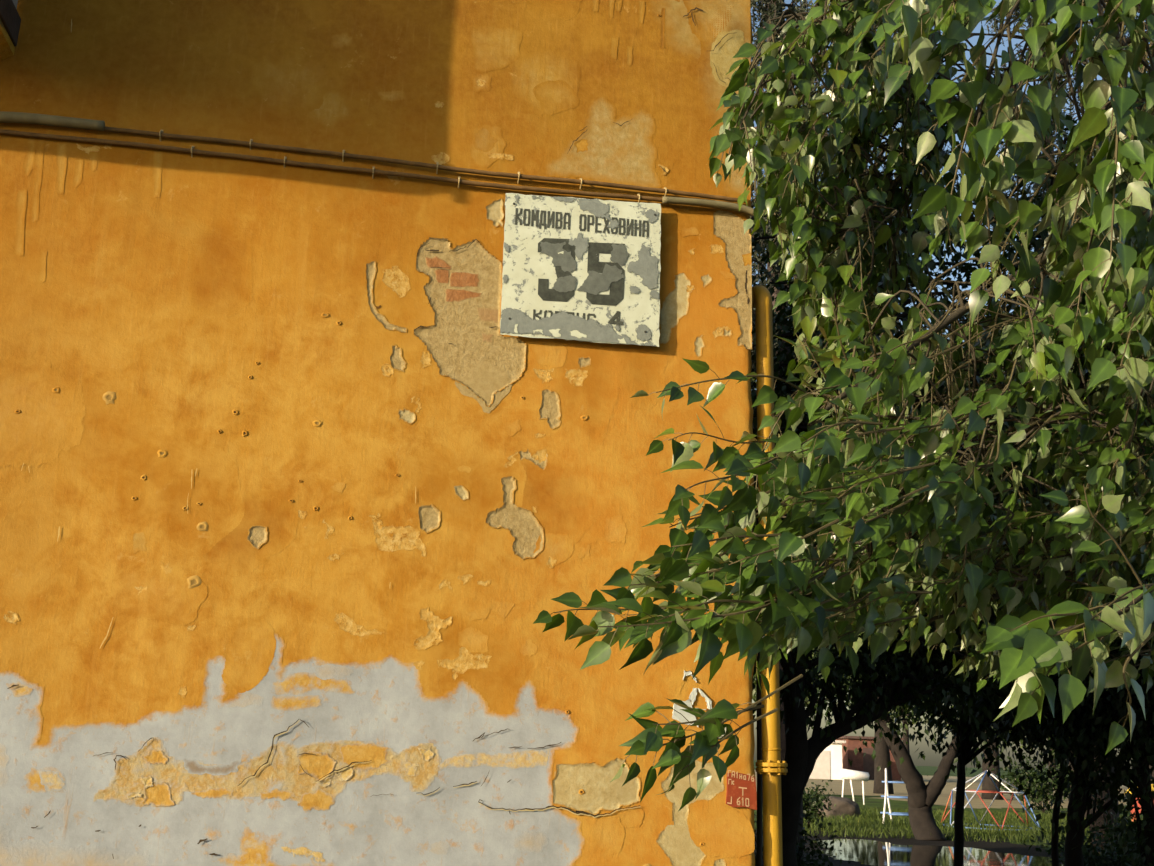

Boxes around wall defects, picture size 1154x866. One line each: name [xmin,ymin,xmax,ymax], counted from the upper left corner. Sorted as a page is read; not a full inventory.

spalling [469,25,669,188]
peeling [647,0,751,137]
spalling [659,144,752,358]
spalling [365,237,591,569]
peeling [222,621,355,712]
peeling [412,601,514,680]
peeling [23,766,66,794]
peeling [209,826,337,866]
crack [238,719,372,787]
spalling [93,737,644,855]
crack [370,770,641,818]
spalling [656,760,755,866]